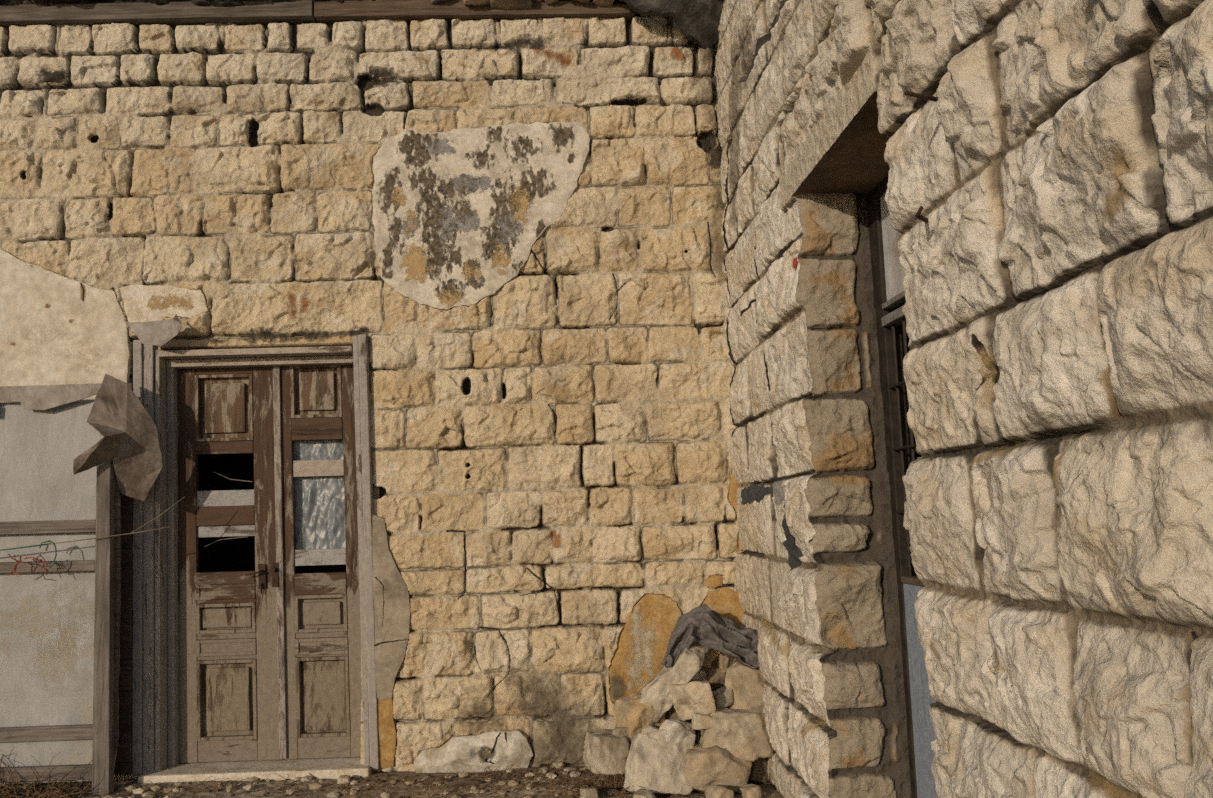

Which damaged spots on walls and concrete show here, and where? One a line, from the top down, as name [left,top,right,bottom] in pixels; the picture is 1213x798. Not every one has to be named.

damp [378,123,575,300]
crack [474,627,510,698]